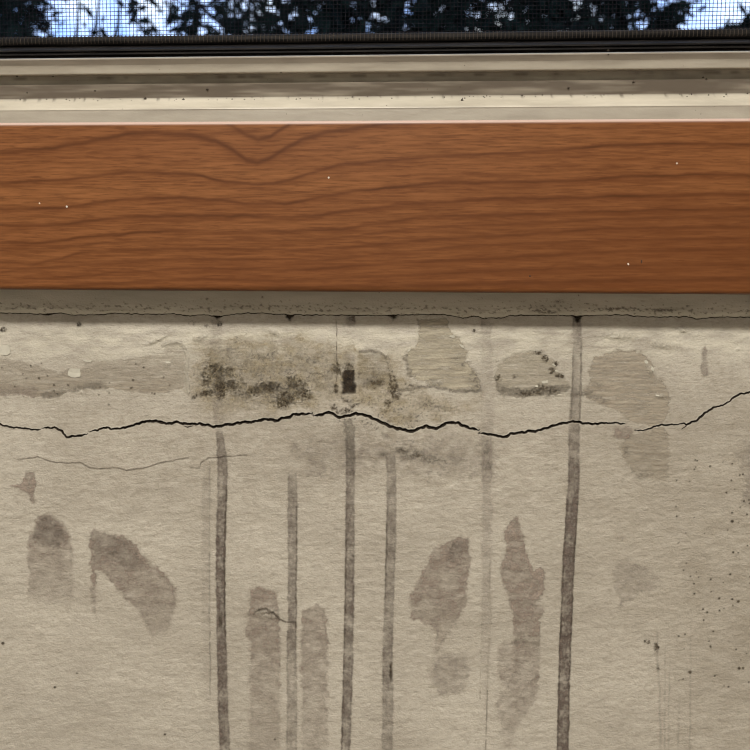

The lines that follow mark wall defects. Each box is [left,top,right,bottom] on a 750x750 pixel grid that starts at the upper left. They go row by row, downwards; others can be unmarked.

crack [0,390,750,440]
water stain [360,360,419,421]
peeling [398,319,480,392]
peeling [496,351,569,398]
water stain [89,535,176,605]
water stain [216,439,229,750]
water stain [246,587,329,667]
water stain [344,484,354,618]
water stain [410,537,470,631]
water stain [501,518,545,667]
water stain [557,457,580,750]
water stain [342,657,353,750]